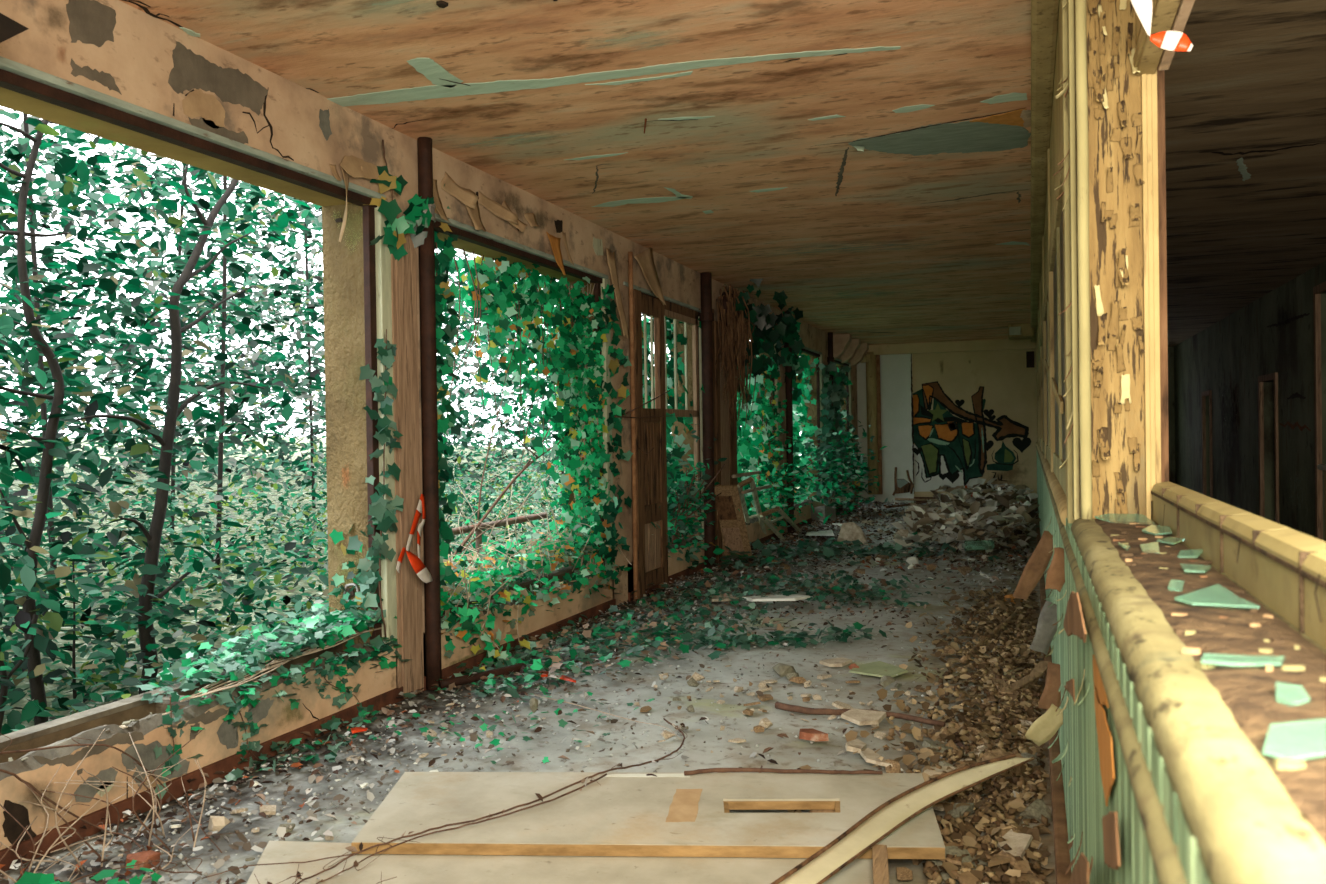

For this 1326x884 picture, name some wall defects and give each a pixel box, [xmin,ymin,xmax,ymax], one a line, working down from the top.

peeling [66,0,122,95]
peeling [168,41,268,144]
crack [242,88,294,161]
flaking render [319,46,901,141]
peeling [1088,0,1145,229]
peeling [1091,248,1145,413]
peeling [1092,427,1179,569]
peeling [32,698,274,802]
peeling [871,520,1121,884]
spalling [2,800,36,845]